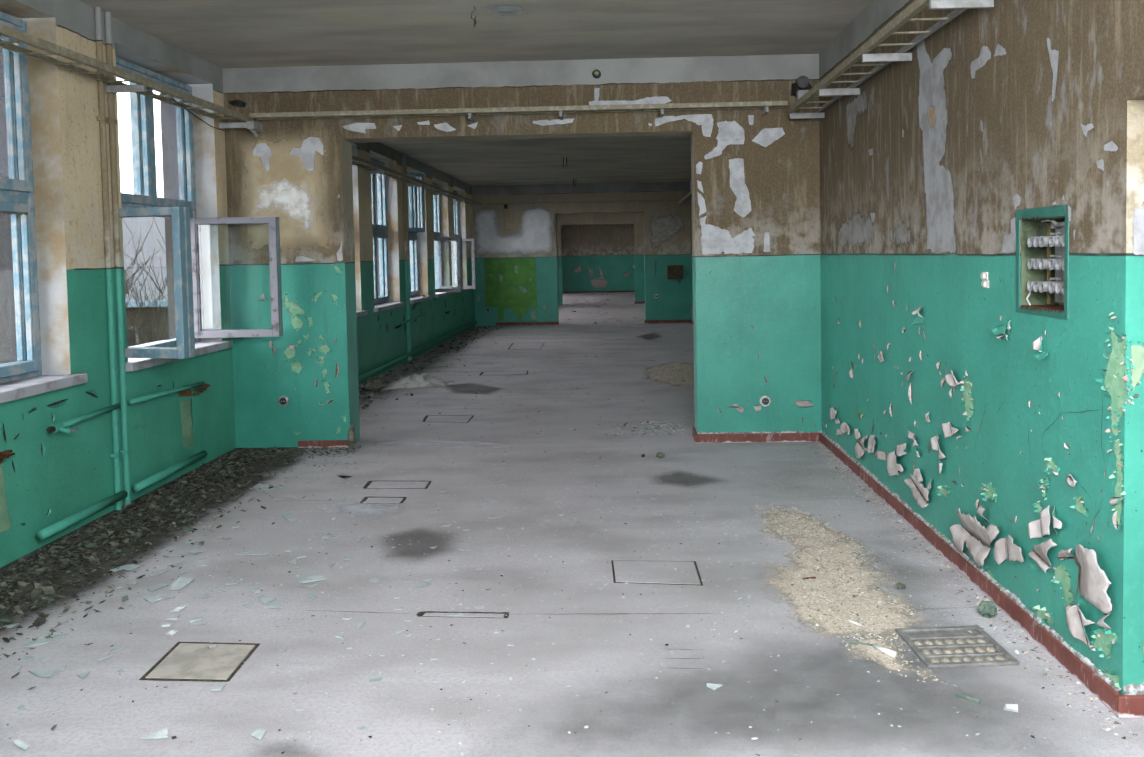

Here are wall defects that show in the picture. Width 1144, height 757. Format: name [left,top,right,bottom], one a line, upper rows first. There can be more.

flaking render [969,42,1006,80]
flaking render [1047,38,1059,102]
flaking render [241,136,343,275]
flaking render [341,122,376,134]
flaking render [417,120,478,132]
flaking render [526,118,574,126]
flaking render [588,88,785,255]
flaking render [890,40,956,254]
flaking render [1081,123,1119,187]
flaking render [475,209,552,295]
peeling [265,290,344,405]
spalling [698,284,1144,695]